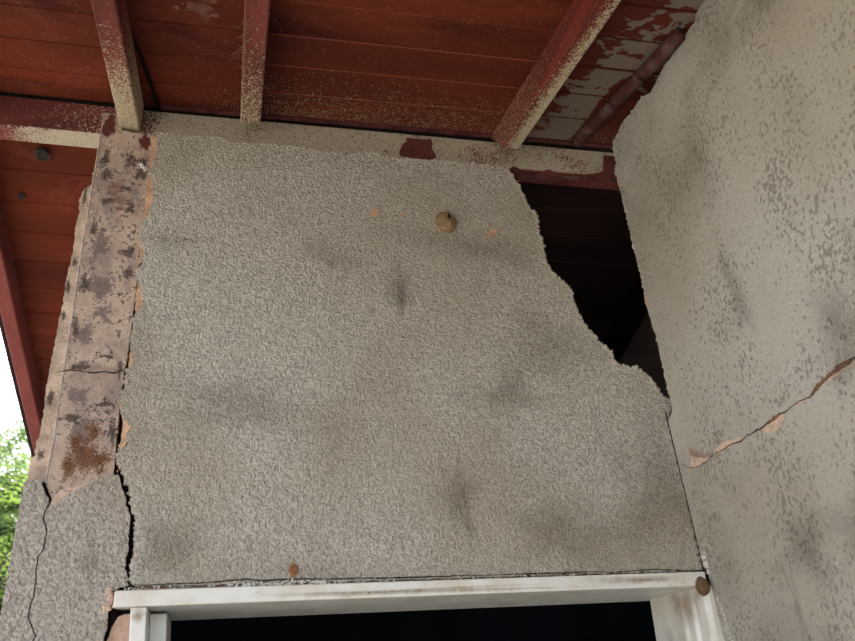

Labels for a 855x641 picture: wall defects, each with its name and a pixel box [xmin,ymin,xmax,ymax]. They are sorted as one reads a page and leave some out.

peeling [101,112,116,137]
crack [132,134,159,329]
peeling [138,96,672,405]
crack [29,482,61,640]
spalling [50,456,112,506]
corrosion [60,419,115,483]
corrosion [288,562,299,577]
crack [56,351,855,641]